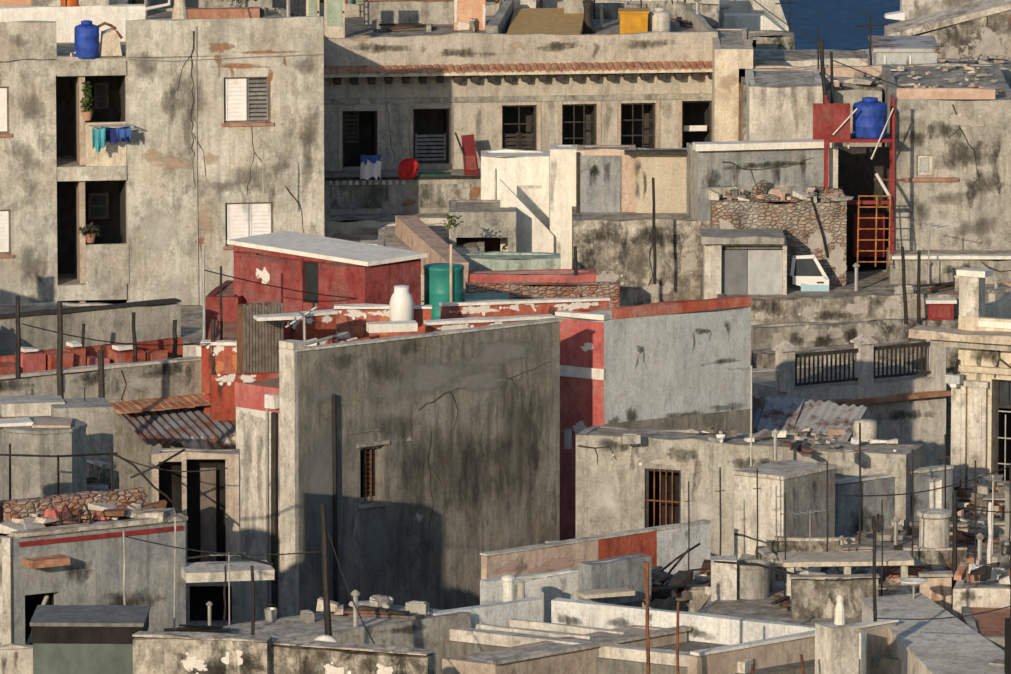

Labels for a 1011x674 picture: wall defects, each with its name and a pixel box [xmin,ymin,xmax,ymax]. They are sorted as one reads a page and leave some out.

spalling [937,16,1011,59]
leakage [904,125,1001,201]
spalling [246,267,270,296]
spalling [181,652,208,674]
spalling [221,649,243,666]
spalling [324,662,351,674]
spalling [376,663,394,674]